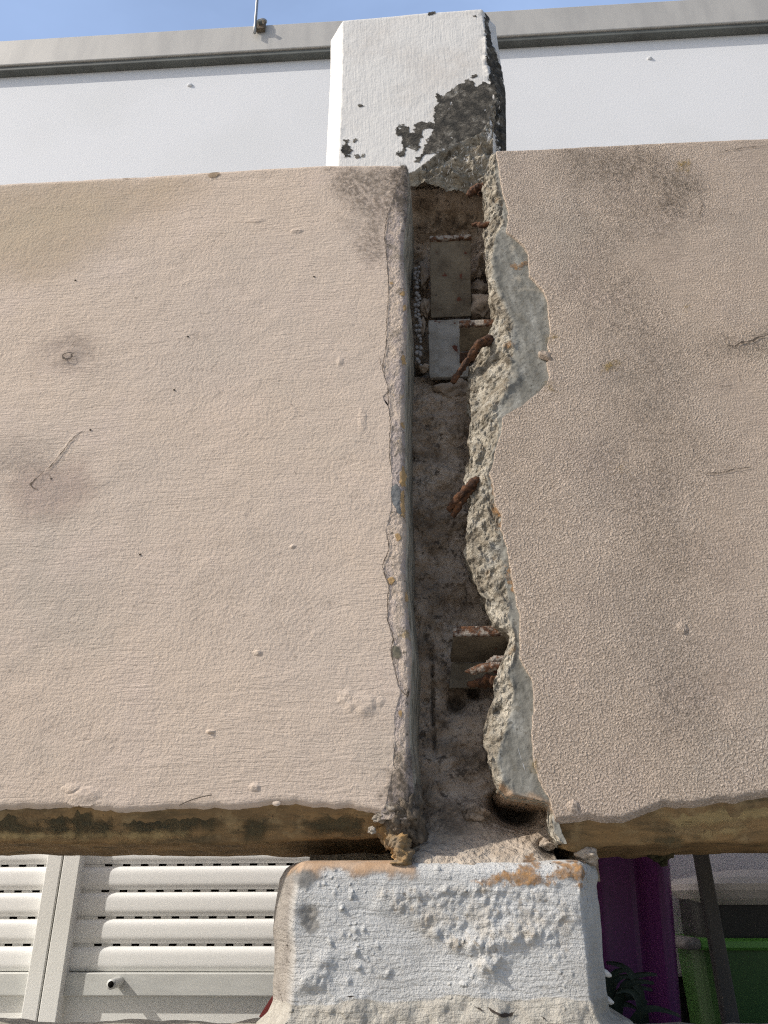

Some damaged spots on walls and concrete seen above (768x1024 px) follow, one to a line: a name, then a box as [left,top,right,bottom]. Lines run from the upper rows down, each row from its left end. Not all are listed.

spalling [395,13,567,851]
leakage [0,831,184,839]
spalling [368,779,429,866]
leakage [670,807,768,837]
rust [476,854,586,887]